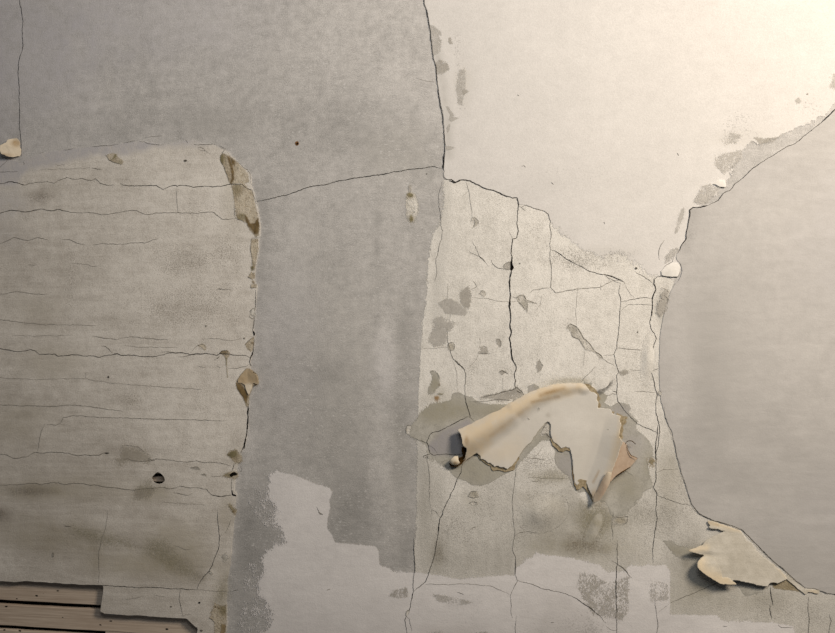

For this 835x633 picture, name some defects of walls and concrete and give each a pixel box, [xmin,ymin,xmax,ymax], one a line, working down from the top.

peeling [0,138,21,157]
spalling [220,152,260,288]
crack [0,3,551,389]
spalling [0,600,101,608]
spalling [0,625,106,633]
crack [4,405,249,615]
spalling [236,368,259,407]
crack [405,291,629,633]
peeling [405,370,658,525]
crack [531,109,835,633]
peeling [663,521,820,596]